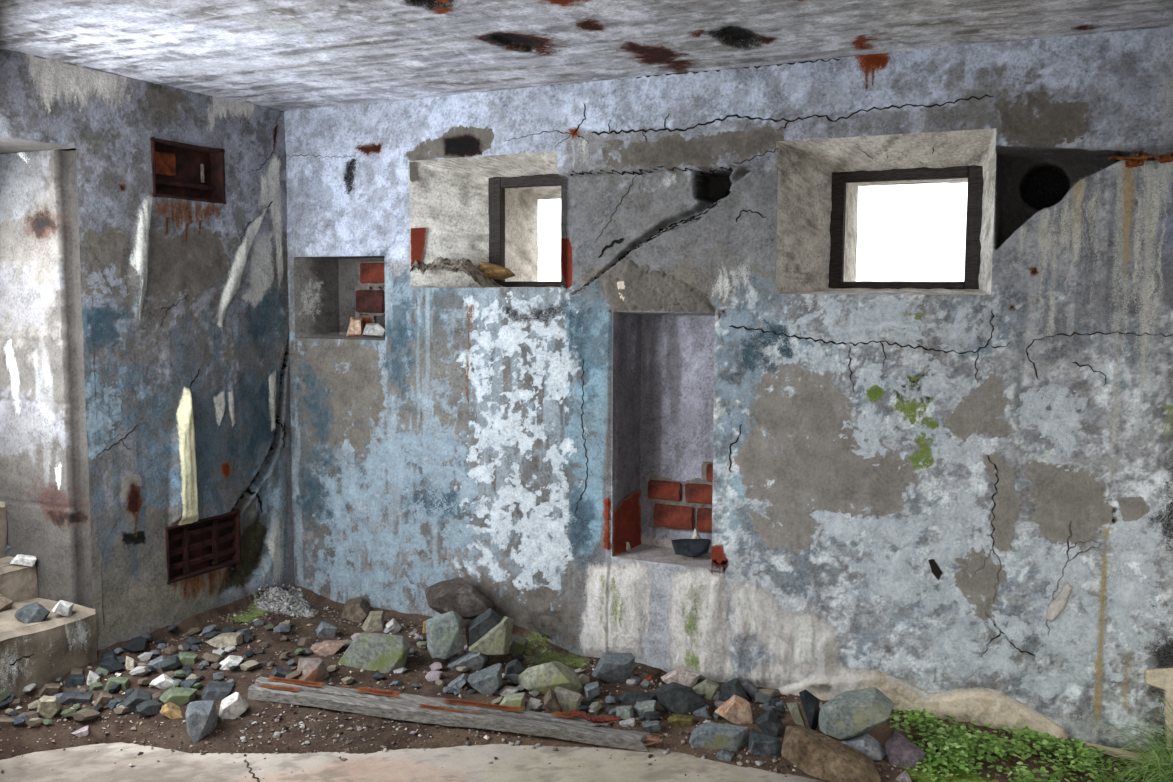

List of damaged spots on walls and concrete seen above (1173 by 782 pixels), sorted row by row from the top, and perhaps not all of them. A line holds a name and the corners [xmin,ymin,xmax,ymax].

corrosion [604,27,705,73]
corrosion [150,137,226,245]
peeling [406,125,494,182]
crack [506,83,993,291]
corrosion [165,508,242,602]
peeling [294,227,587,648]
peeling [715,307,1165,746]
crack [729,311,1172,392]
crack [971,456,1035,658]
leakage [1001,141,1173,501]
leakage [1091,519,1113,723]
flaking render [1144,668,1173,752]